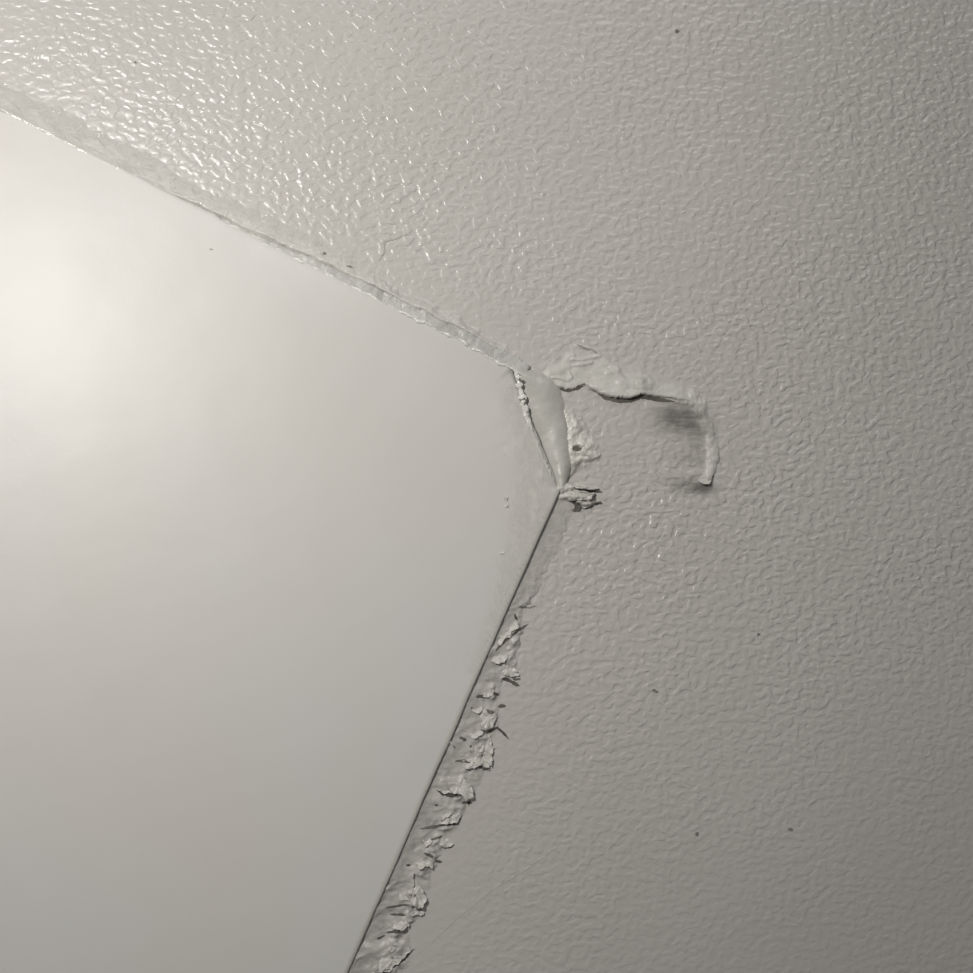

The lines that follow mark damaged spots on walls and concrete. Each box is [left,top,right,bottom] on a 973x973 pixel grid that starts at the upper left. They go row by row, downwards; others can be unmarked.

peeling [543,343,720,484]
peeling [563,483,593,512]
peeling [499,663,521,687]
peeling [377,689,509,939]
peeling [371,946,414,973]